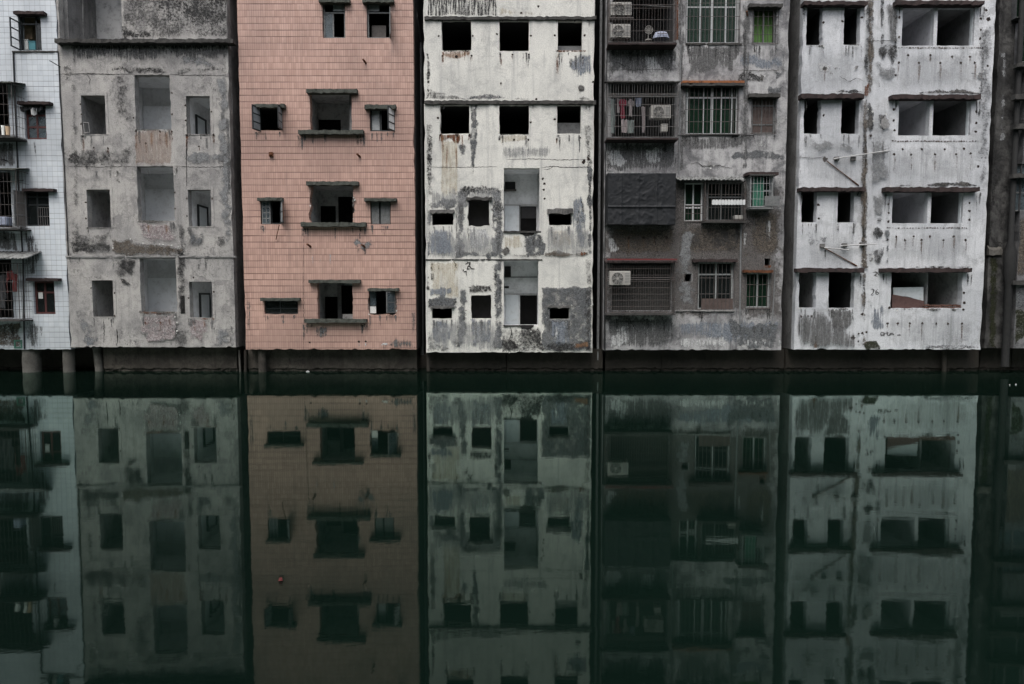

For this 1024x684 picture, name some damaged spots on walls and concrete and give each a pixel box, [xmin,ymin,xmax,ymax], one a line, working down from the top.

leakage [64,0,231,246]
leakage [69,222,232,345]
rust [439,134,471,143]
leakage [427,52,593,352]
leakage [798,0,900,349]